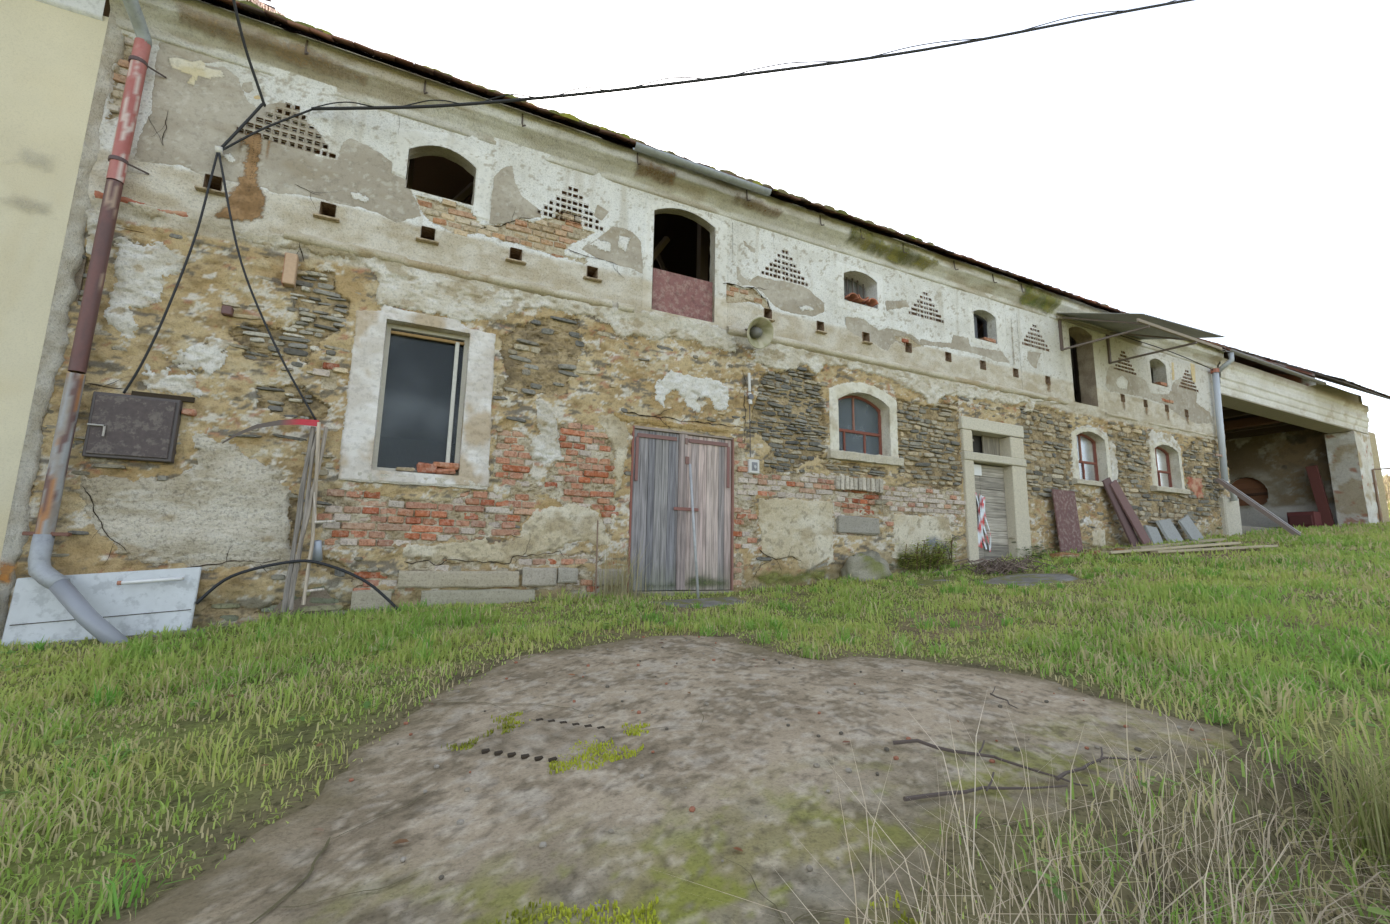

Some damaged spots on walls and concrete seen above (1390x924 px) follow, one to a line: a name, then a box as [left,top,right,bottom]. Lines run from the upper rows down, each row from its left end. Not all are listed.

flaking render [86,190,103,255]
flaking render [120,196,188,220]
peeling [133,42,643,279]
flaking render [103,237,196,344]
flaking render [142,336,229,398]
flaking render [226,226,1060,413]
crack [83,487,127,564]
flaking render [317,399,629,593]